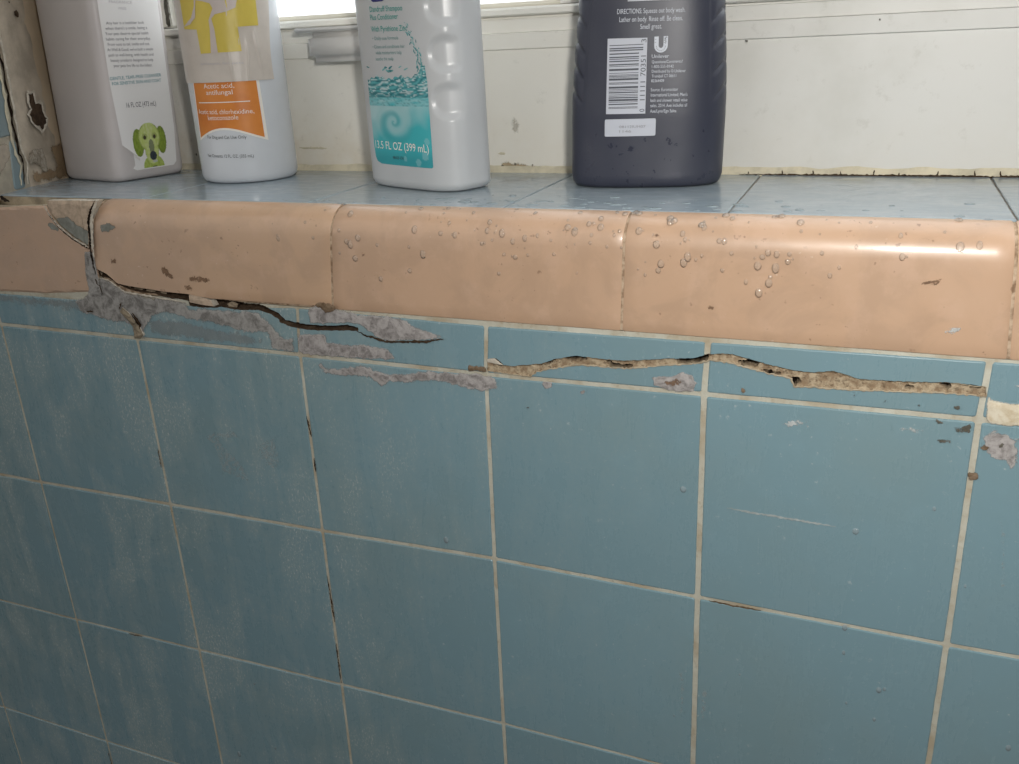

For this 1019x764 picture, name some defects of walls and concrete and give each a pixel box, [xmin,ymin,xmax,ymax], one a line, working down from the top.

peeling [48,217,89,245]
crack [43,200,443,343]
crack [468,354,987,397]
spalling [987,397,1019,426]